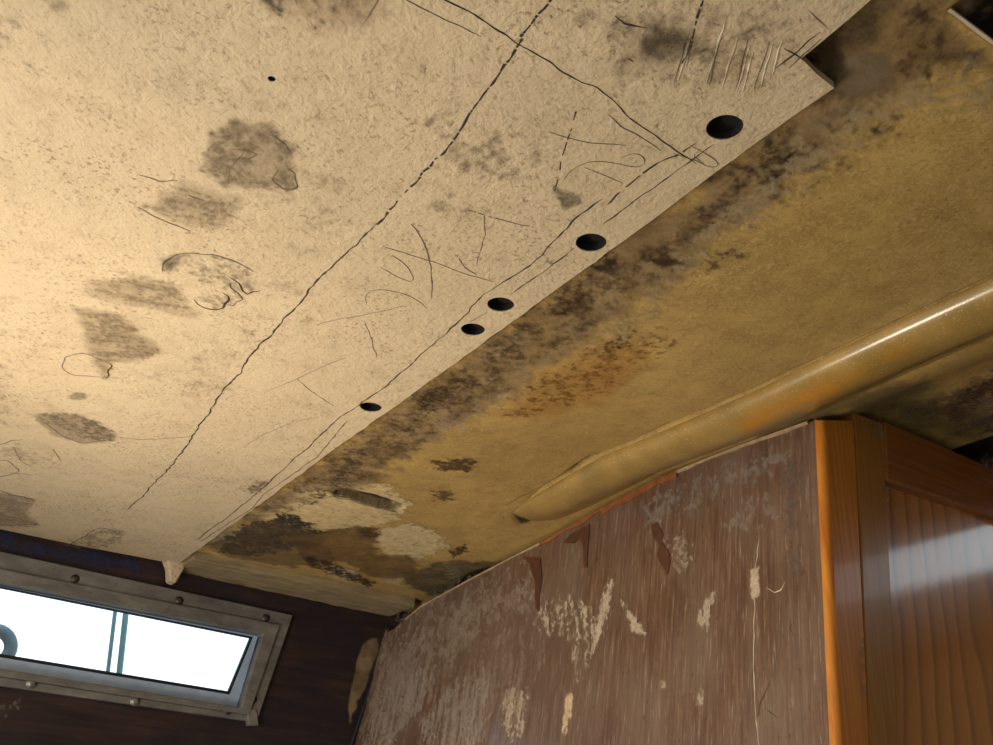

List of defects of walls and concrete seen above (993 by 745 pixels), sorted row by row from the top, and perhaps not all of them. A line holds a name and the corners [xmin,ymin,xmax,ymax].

crack [119,0,552,509]
water stain [61,315,157,380]
water stain [209,77,993,596]
water stain [37,414,115,443]
peeling [202,481,450,559]
peeling [572,579,646,664]
peeling [697,592,714,627]
spalling [750,567,785,599]